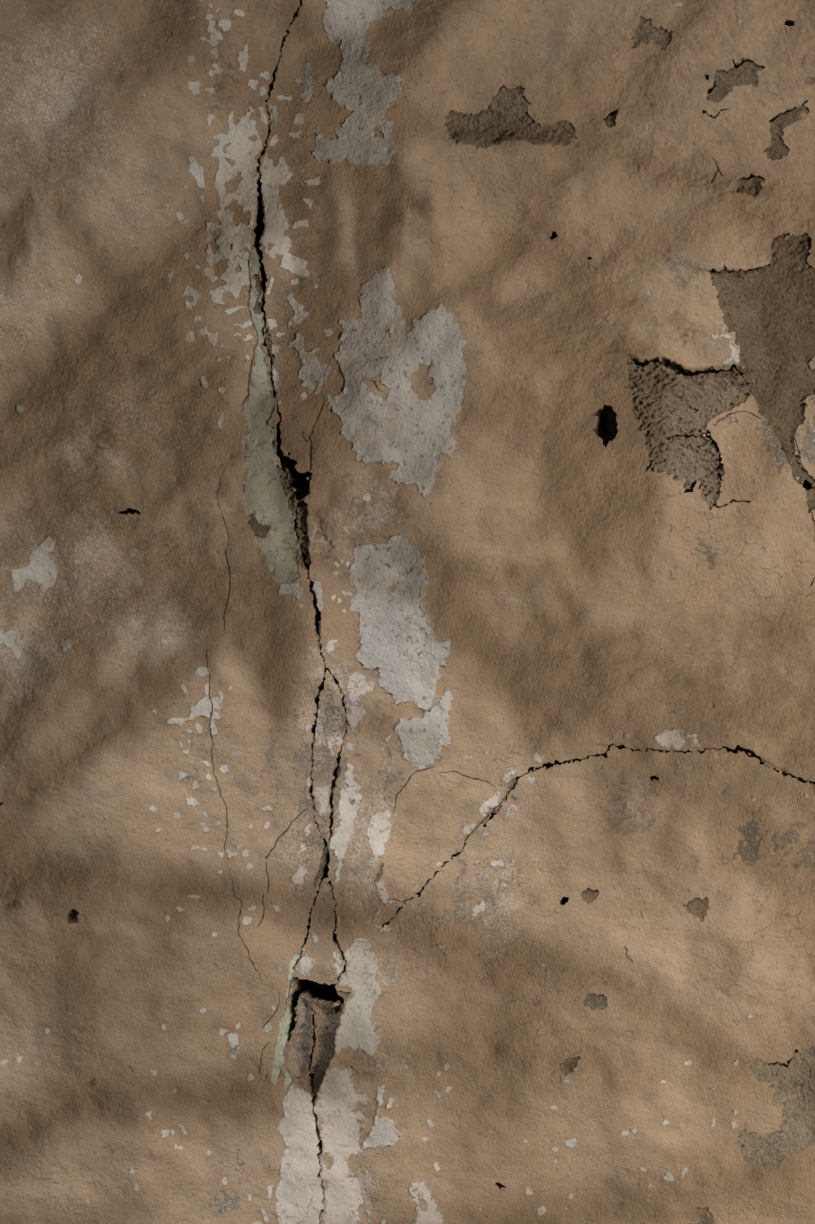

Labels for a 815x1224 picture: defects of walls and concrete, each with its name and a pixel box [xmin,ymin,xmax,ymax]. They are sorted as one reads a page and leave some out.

flaking render [444,85,577,149]
flaking render [702,59,764,119]
flaking render [764,101,809,160]
crack [206,3,347,980]
flaking render [593,406,618,447]
flaking render [625,233,815,513]
peeling [181,0,469,1224]
peeling [153,667,232,833]
peeling [466,858,509,920]
crack [383,743,815,926]
peeling [145,1111,188,1151]
crack [309,1073,325,1212]